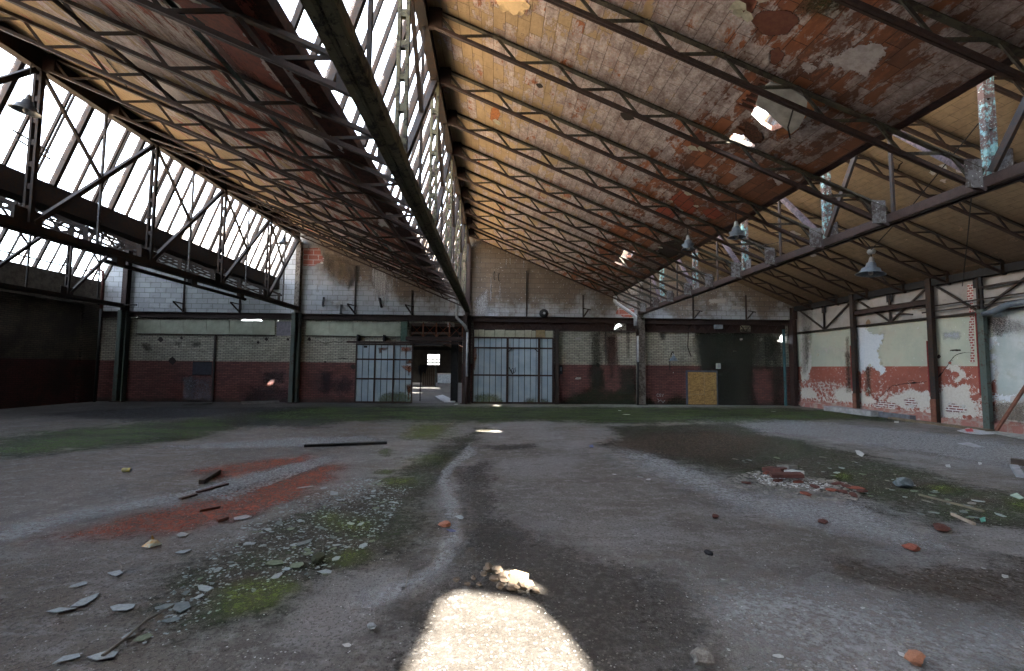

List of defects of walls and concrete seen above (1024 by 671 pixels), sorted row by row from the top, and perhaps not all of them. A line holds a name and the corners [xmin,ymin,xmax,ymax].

peeling [728,0,769,22]
spalling [732,79,769,144]
peeling [800,284,978,419]